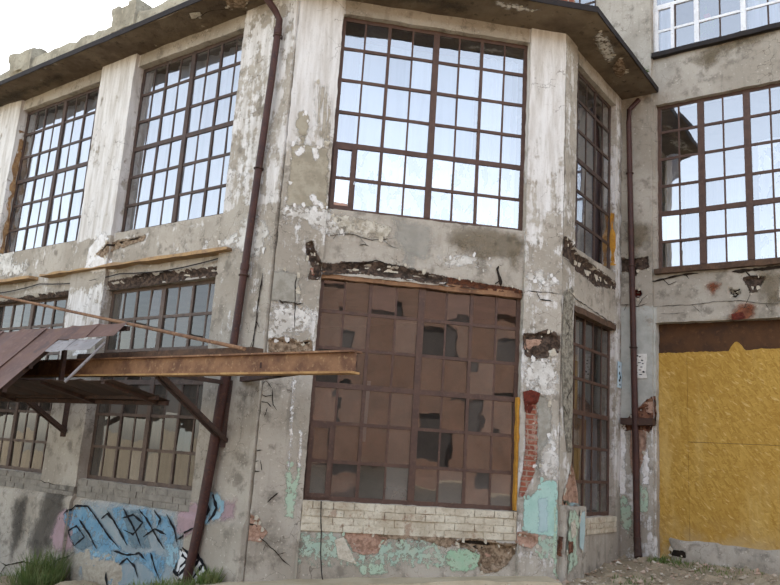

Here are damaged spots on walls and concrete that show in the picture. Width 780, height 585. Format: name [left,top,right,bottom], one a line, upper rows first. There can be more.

peeling [283,79,392,243]
spalling [85,232,218,290]
spalling [268,240,523,352]
damp [452,231,521,255]
spalling [562,236,616,289]
spalling [730,275,765,308]
peeling [284,378,302,518]
peeling [298,270,585,579]
spalling [620,396,657,534]